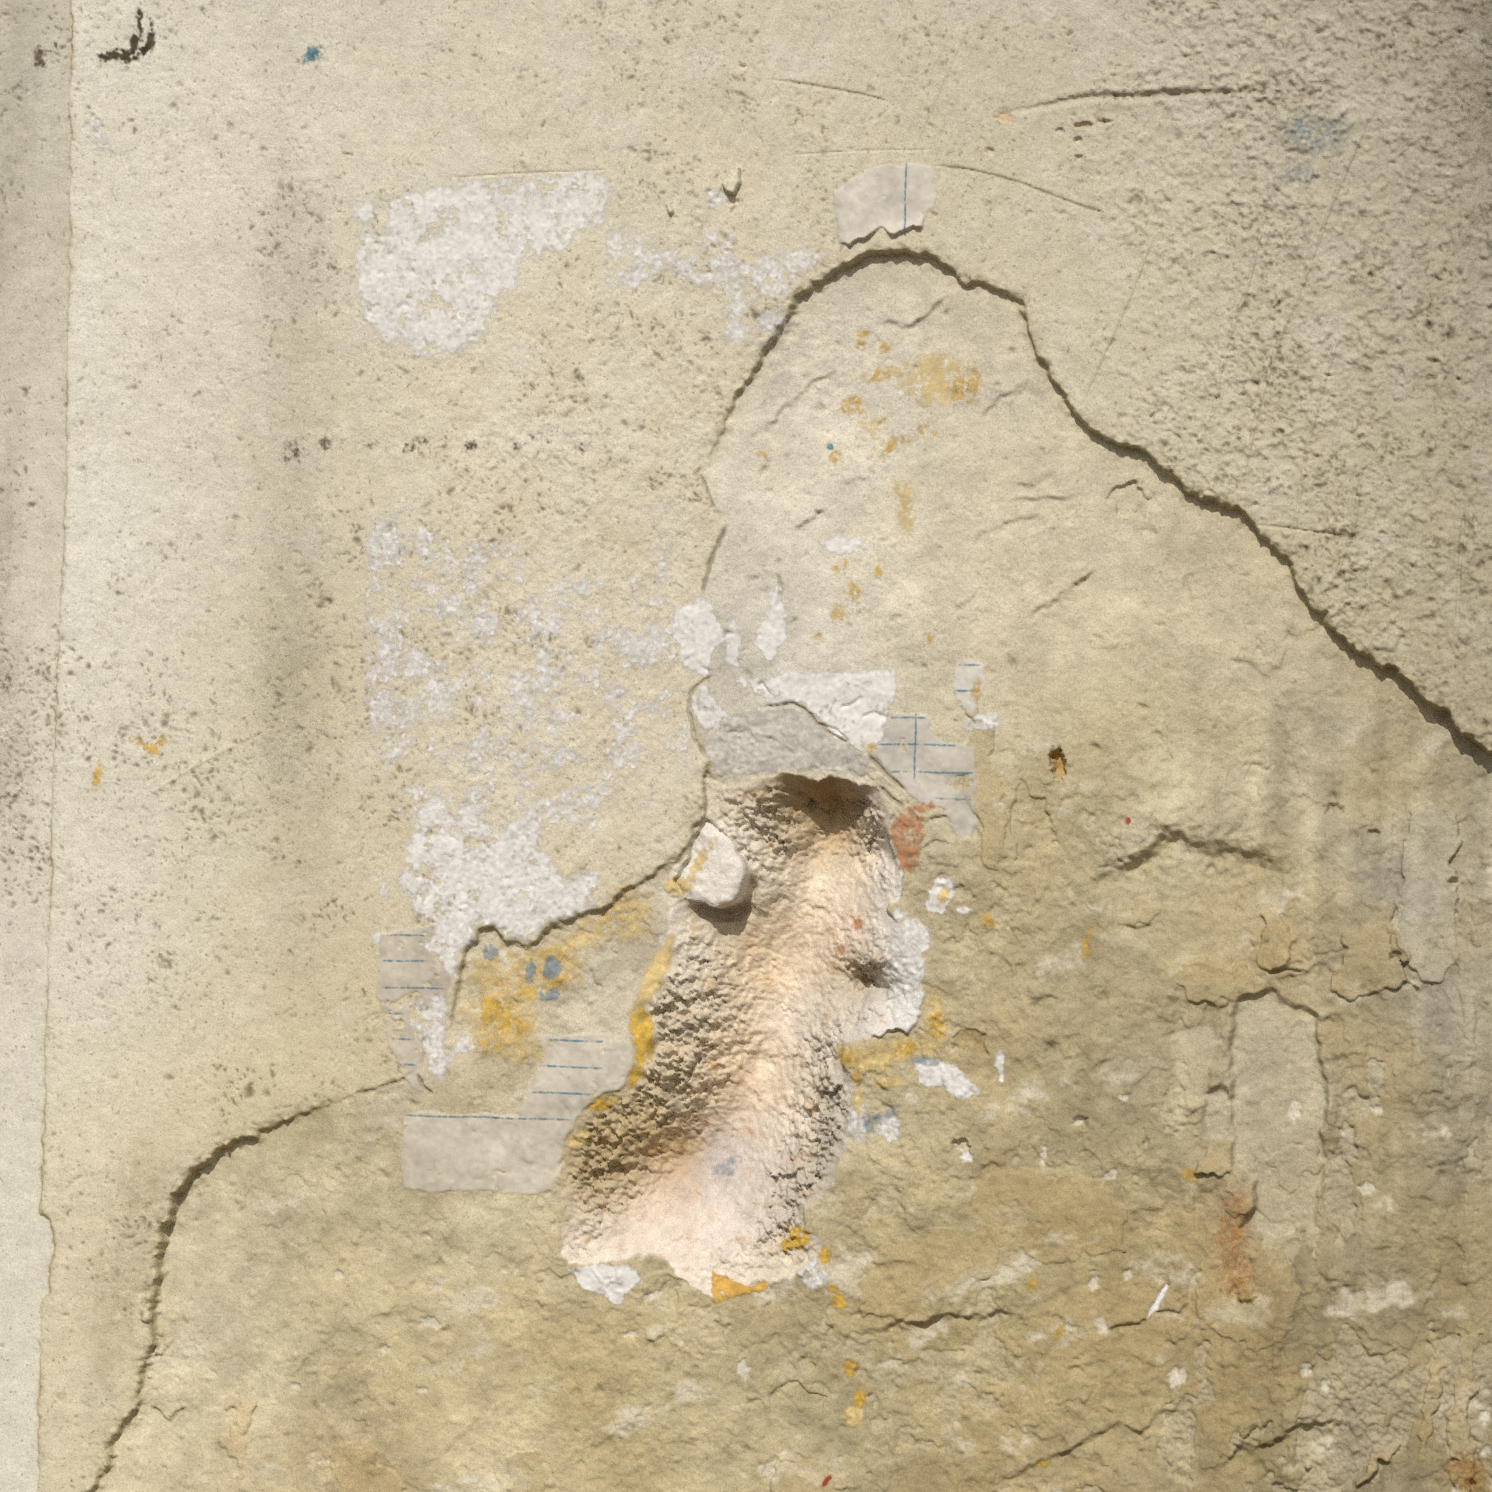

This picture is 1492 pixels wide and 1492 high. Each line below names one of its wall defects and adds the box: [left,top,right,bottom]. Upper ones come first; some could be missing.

peeling [352,170,614,358]
crack [699,474,729,600]
crack [776,572,784,602]
crack [688,675,731,762]
crack [759,695,953,852]
spalling [91,228,1492,1492]
crack [352,1036,435,1097]
crack [151,1405,188,1425]